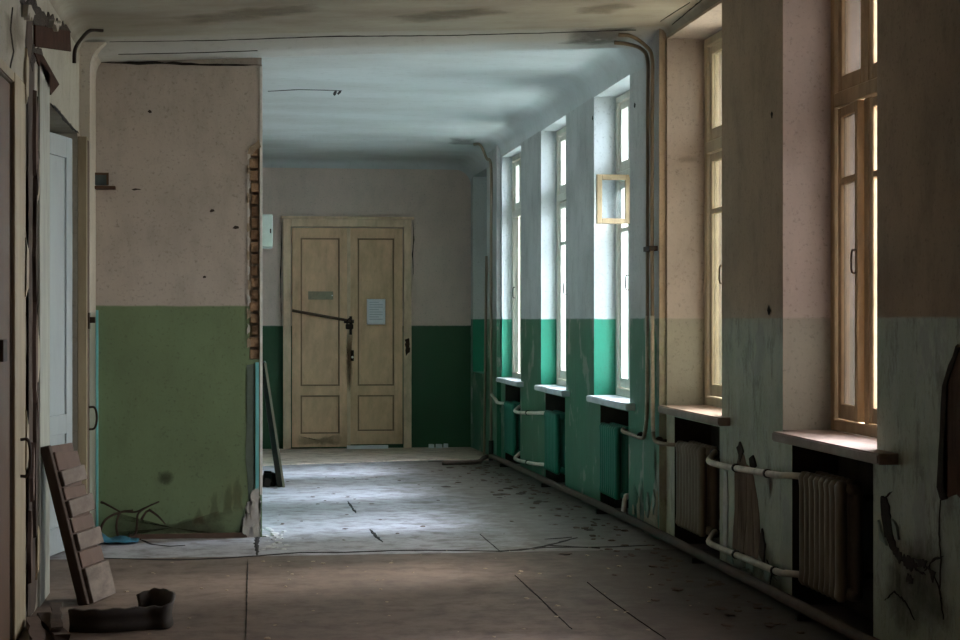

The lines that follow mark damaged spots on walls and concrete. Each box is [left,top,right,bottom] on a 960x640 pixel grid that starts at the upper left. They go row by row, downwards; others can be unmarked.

spalling [20,0,71,617]
flaking render [233,140,261,538]
spalling [723,441,771,582]
spalling [877,344,960,620]